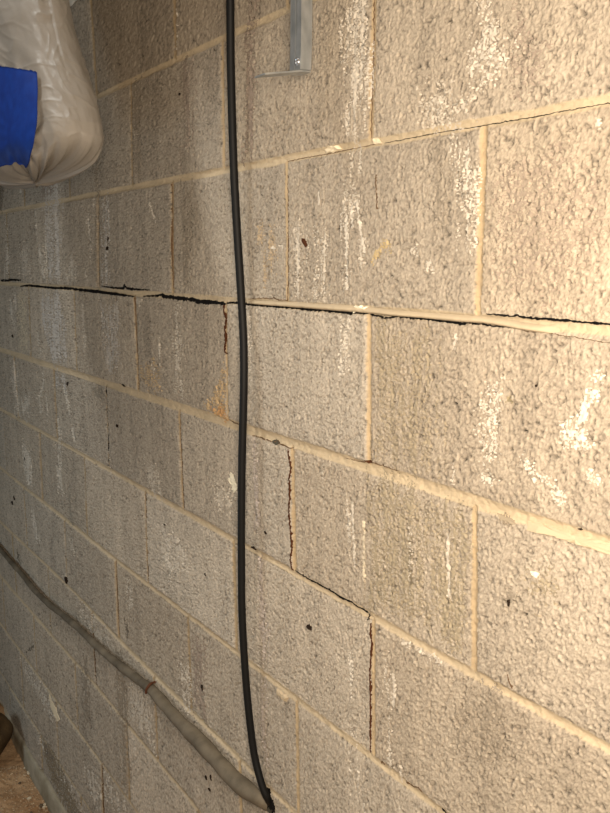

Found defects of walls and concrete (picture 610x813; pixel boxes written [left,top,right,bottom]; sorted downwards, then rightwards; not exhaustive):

crack [1,0,610,389]
crack [230,420,385,765]